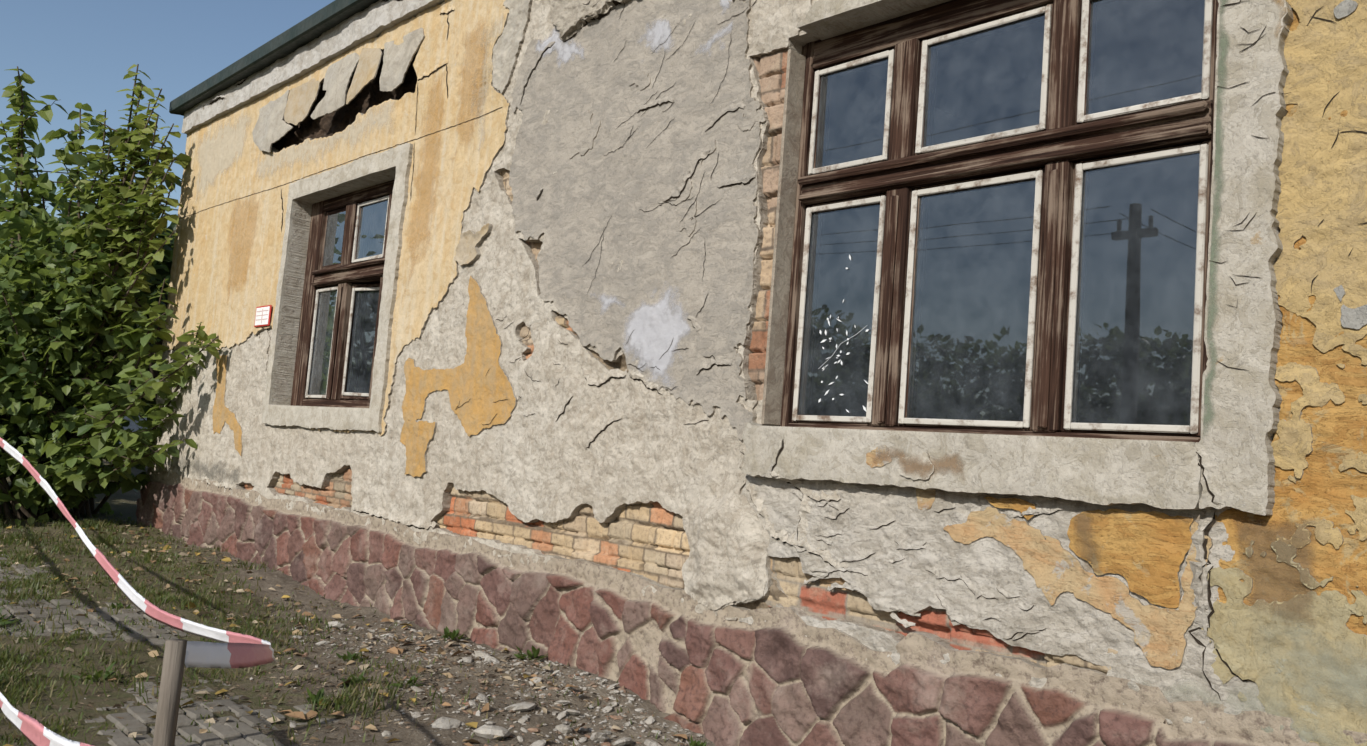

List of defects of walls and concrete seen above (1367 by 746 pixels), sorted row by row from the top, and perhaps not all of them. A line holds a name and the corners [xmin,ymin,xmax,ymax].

crack [179,0,756,450]
peeling [147,0,1266,715]
peeling [1271,285,1367,483]
crack [1188,448,1259,700]
peeling [1263,495,1367,589]
peeling [1348,586,1367,624]